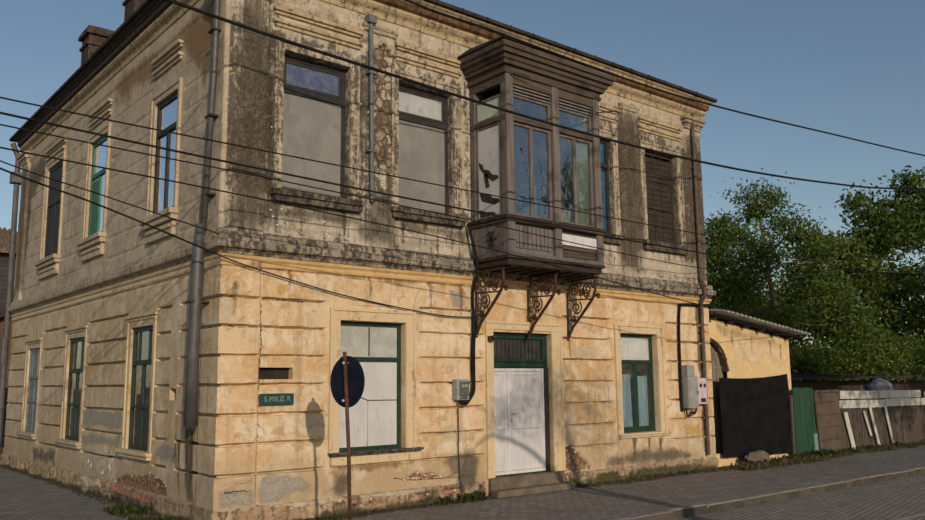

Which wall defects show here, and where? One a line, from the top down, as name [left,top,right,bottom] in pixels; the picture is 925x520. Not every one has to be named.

flaking render [360,42,396,189]
damp [361,163,468,246]
crack [227,299,304,398]
flaking render [80,447,166,503]
crack [224,424,266,502]
flaking render [275,471,441,509]
flaking render [563,446,593,472]